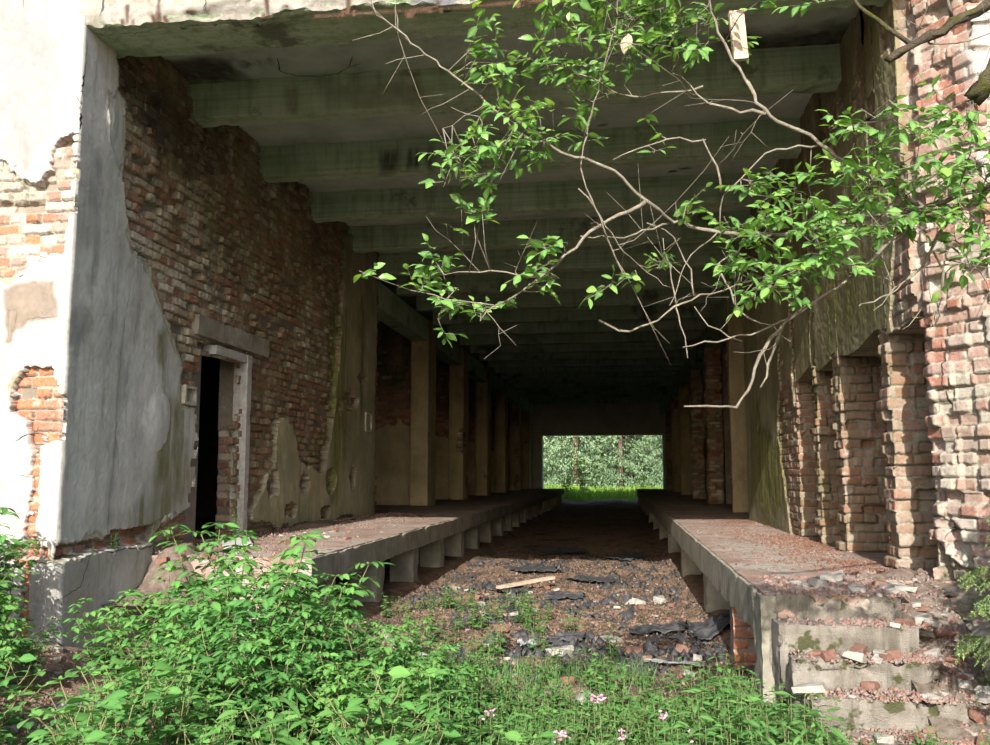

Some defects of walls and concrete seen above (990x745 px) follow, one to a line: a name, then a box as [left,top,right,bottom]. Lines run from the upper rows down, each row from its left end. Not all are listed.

leakage [4,281,56,342]
flaking render [0,132,79,279]
crack [55,270,153,600]
flaking render [6,365,218,638]
flaking render [117,56,380,537]
flaking render [895,0,990,593]